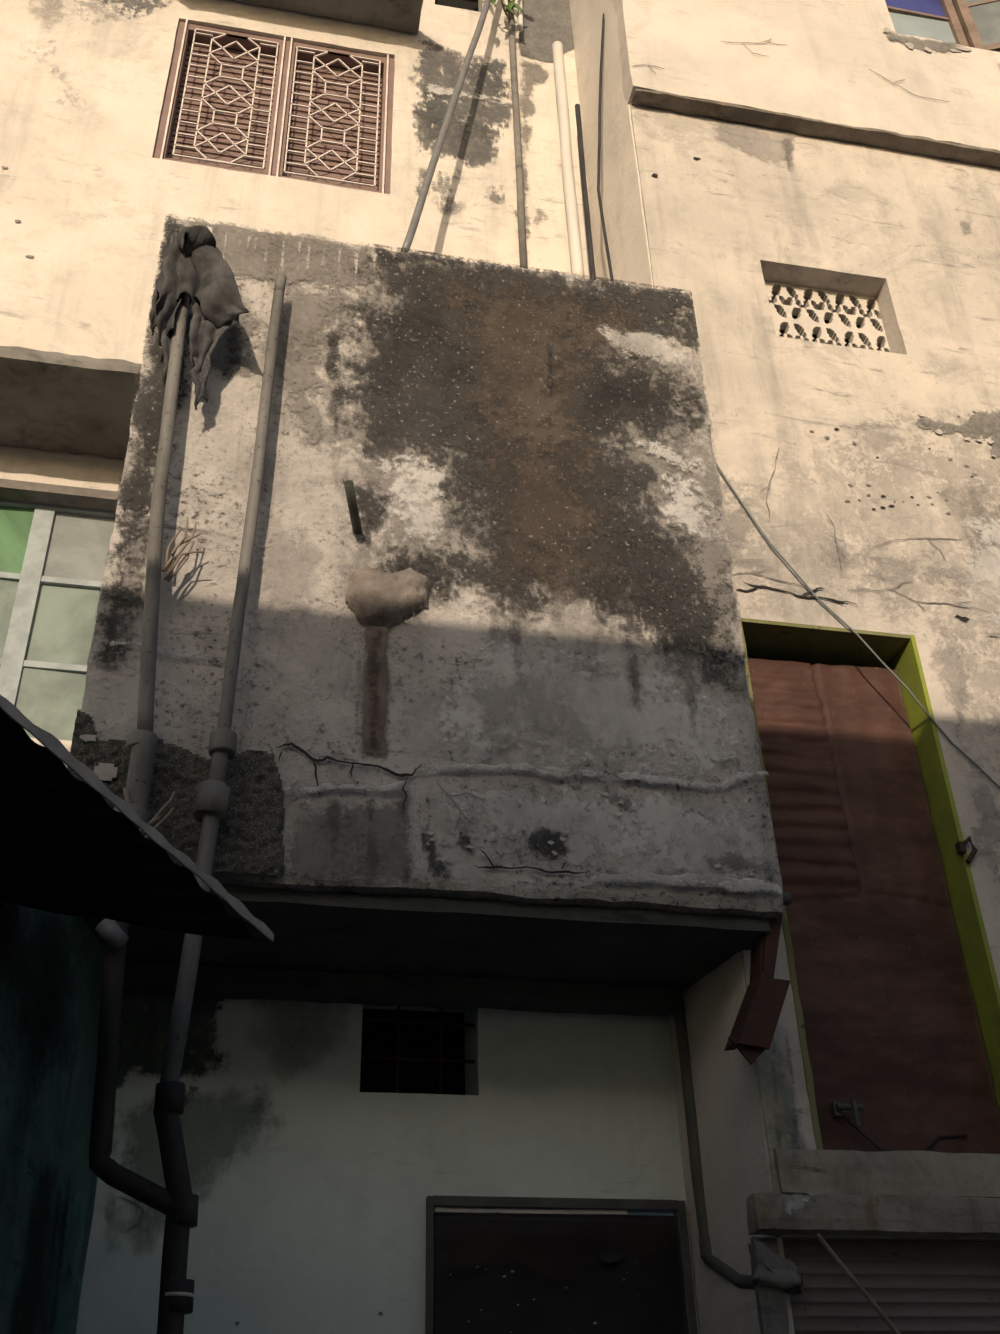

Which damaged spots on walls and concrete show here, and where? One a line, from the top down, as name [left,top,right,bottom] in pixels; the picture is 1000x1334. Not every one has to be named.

water stain [104,0,169,18]
water stain [410,40,549,237]
water stain [92,305,193,669]
water stain [150,214,753,771]
crack [733,513,1000,638]
rust [356,625,389,756]
spalling [67,709,130,809]
spalling [148,731,211,867]
spalling [212,745,285,877]
crack [276,742,590,874]